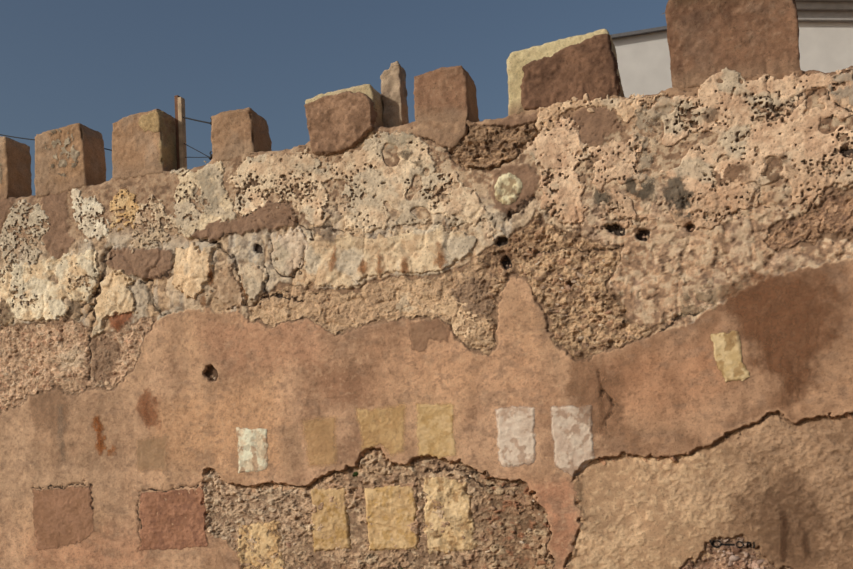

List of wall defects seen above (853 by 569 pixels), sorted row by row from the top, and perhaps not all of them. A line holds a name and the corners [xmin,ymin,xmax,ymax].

crack [75,252,115,381]
crack [197,218,355,307]
flaking render [0,68,853,413]
damp [726,272,838,394]
rust [93,417,113,454]
spalling [200,449,556,569]
spalling [567,412,853,569]